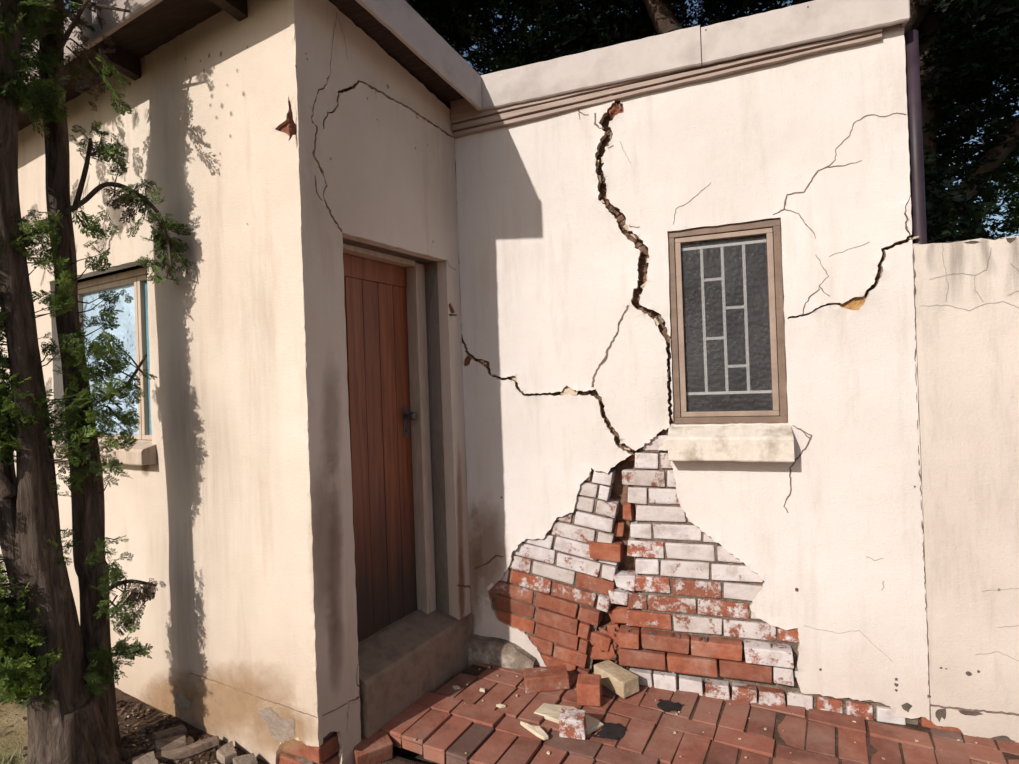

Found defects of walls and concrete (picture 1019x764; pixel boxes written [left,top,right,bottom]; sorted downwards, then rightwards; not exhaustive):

crack [319,13,376,113]
spalling [278,96,296,141]
crack [448,101,674,457]
crack [773,113,1019,716]
spalling [489,435,963,734]
leakage [150,679,262,729]
spalling [258,707,340,764]
spalling [520,721,548,740]